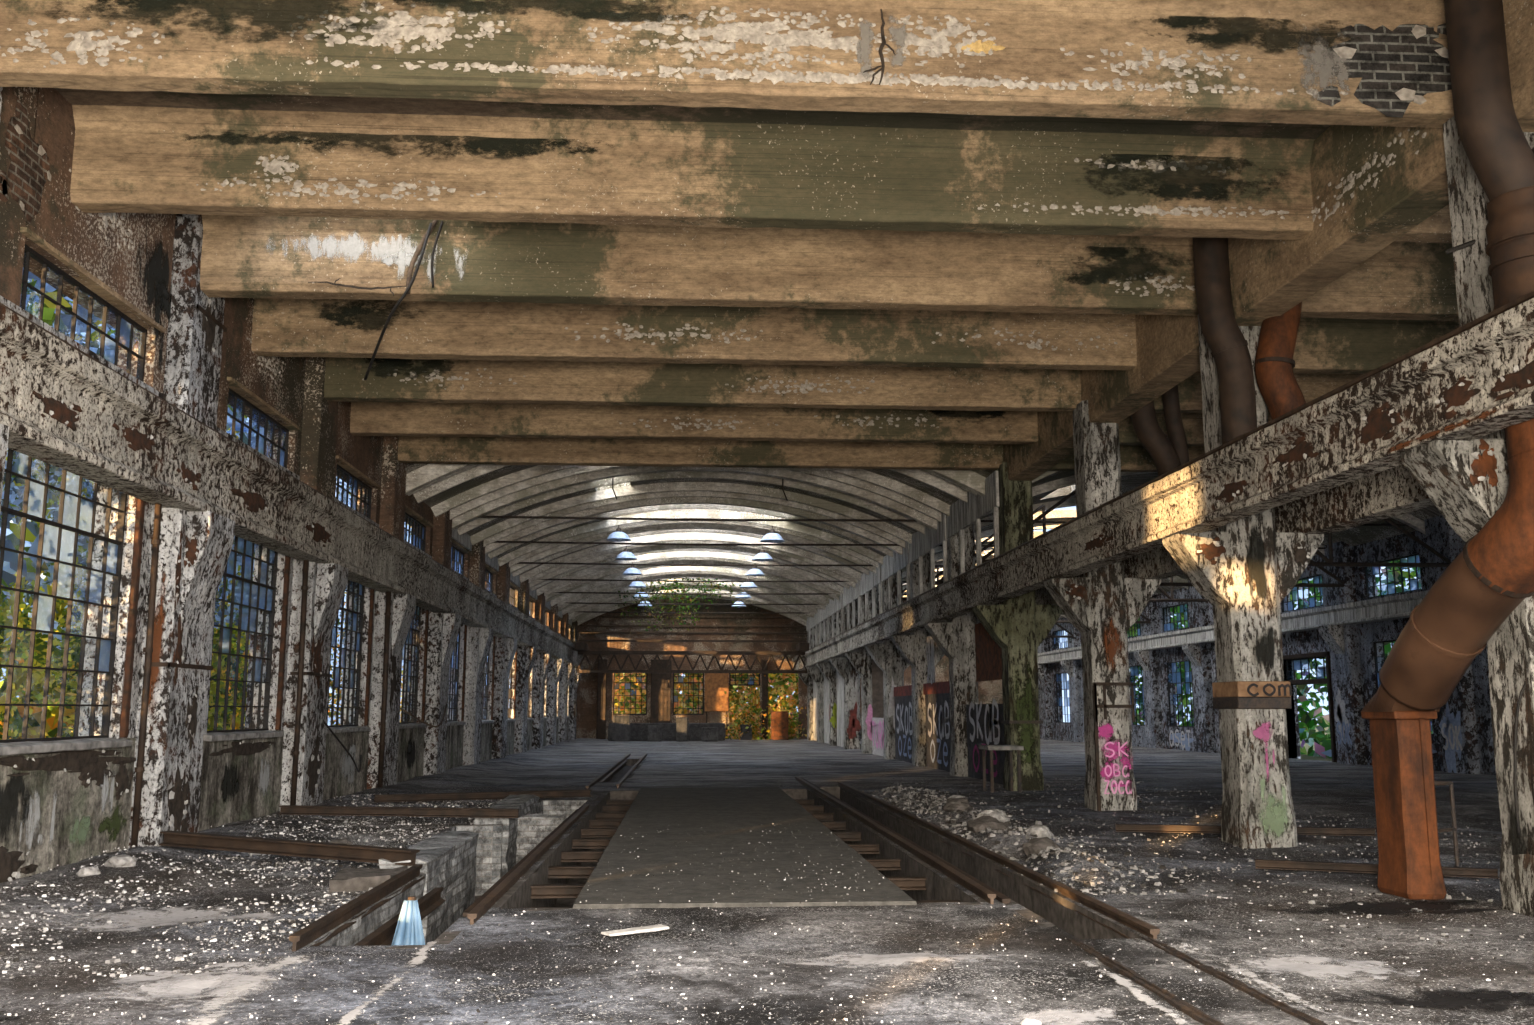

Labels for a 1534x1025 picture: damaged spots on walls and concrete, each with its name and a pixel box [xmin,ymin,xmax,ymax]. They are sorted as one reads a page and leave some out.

leakage [0,0,1359,96]
crack [863,9,896,85]
spalling [1317,23,1452,118]
leakage [186,130,599,204]
leakage [978,154,1289,219]
leakage [1307,127,1427,226]
leakage [1068,246,1196,297]
peeling [33,391,82,431]
peeling [1435,360,1534,420]
peeling [1470,439,1503,487]
peeling [173,529,199,685]
spalling [0,846,38,883]